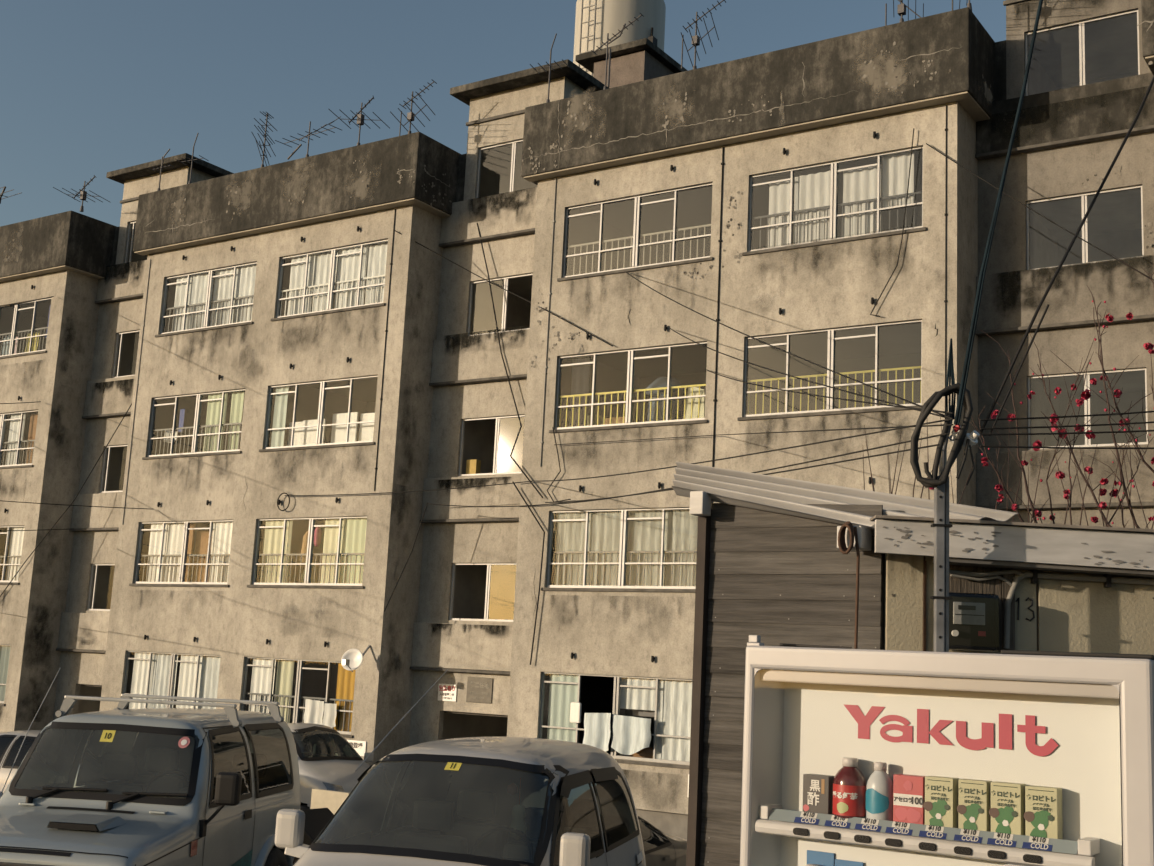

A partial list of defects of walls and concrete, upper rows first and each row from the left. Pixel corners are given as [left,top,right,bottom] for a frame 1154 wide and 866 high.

peeling [520,92,606,177]
crack [529,90,855,169]
water stain [471,187,535,215]
water stain [997,255,1153,311]
water stain [446,326,524,349]
peeling [883,526,934,548]
peeling [949,530,1002,554]
peeling [1081,543,1150,567]
water stain [432,623,506,635]